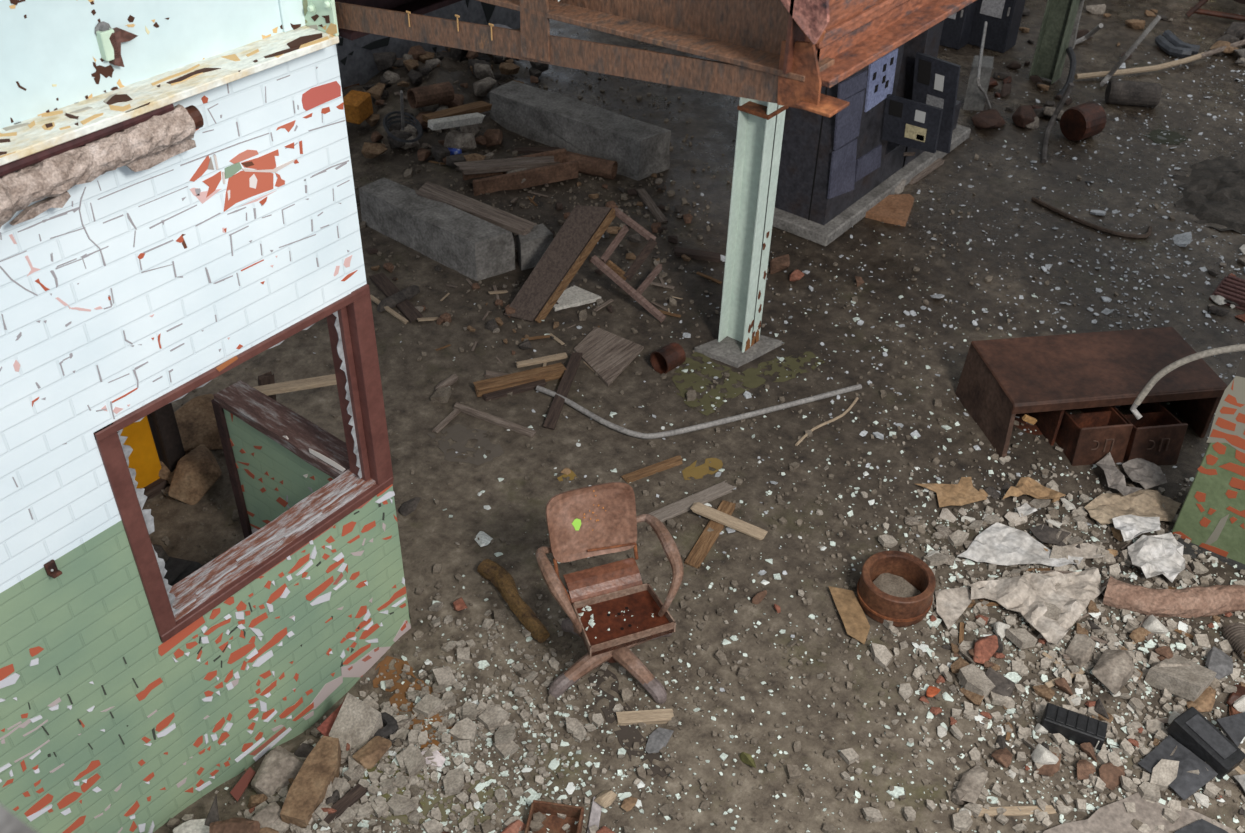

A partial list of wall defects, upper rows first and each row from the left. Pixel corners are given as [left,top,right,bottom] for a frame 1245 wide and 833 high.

corrosion [151,14,337,87]
corrosion [0,57,150,158]
flaking render [276,81,359,132]
spalling [189,149,285,212]
flaking render [1194,380,1245,529]
peeling [175,484,357,615]
peeling [0,664,14,681]
flaking render [158,521,392,793]
flaking render [326,585,407,676]
peeling [142,713,175,743]
peeling [2,760,101,833]
peeling [124,759,166,832]